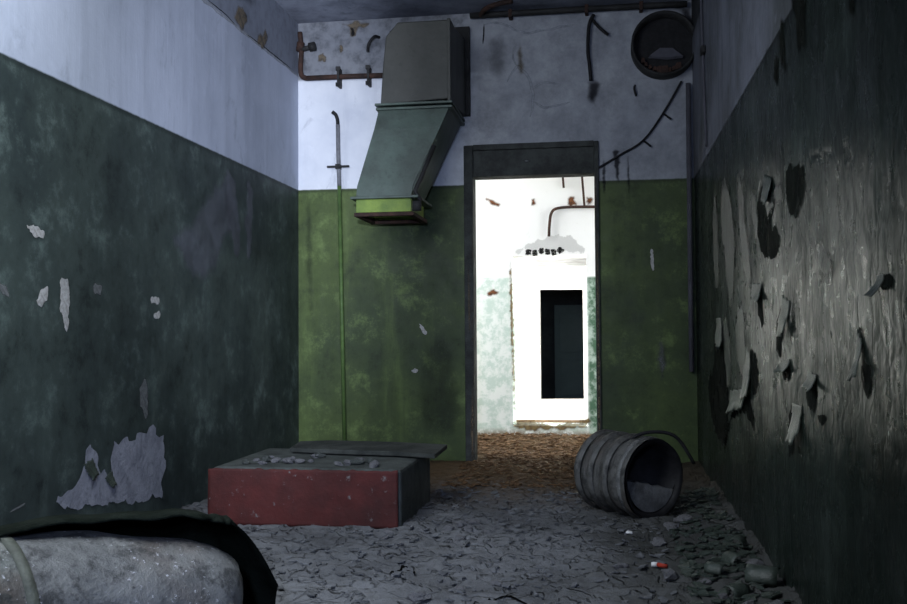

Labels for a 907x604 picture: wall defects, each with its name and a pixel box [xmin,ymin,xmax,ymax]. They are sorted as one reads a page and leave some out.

peeling [27,225,45,238]
peeling [36,286,48,307]
peeling [60,278,70,332]
peeling [708,163,804,450]
peeling [864,273,893,297]
peeling [846,327,872,399]
peeling [785,371,826,457]
peeling [56,378,166,510]
crack [473,592,527,604]